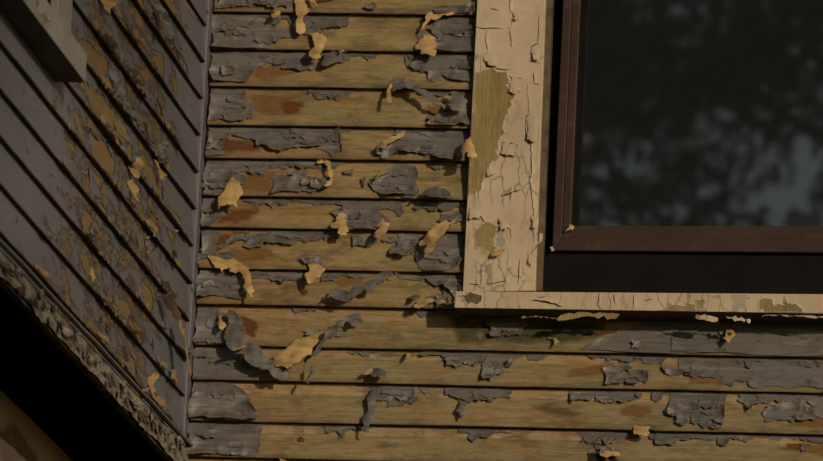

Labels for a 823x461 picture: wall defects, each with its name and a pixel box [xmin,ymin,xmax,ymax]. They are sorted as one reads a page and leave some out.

peeling [0,0,524,456]
crack [468,0,562,307]
peeling [347,294,823,461]
crack [597,294,652,309]